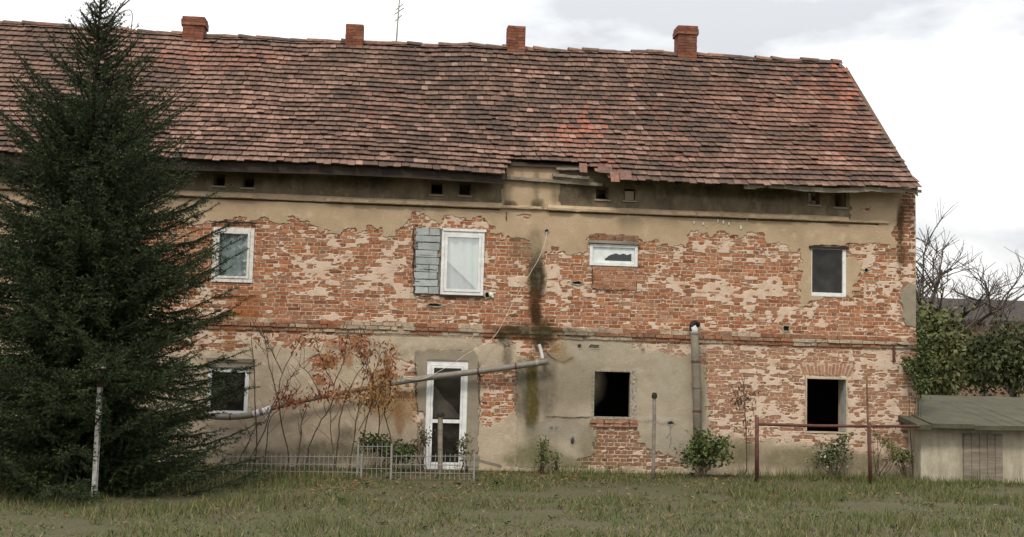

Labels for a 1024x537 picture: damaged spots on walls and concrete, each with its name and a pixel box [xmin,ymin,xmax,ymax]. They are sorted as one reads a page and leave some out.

flaking render [135,192,916,470]
leakage [529,260,545,324]